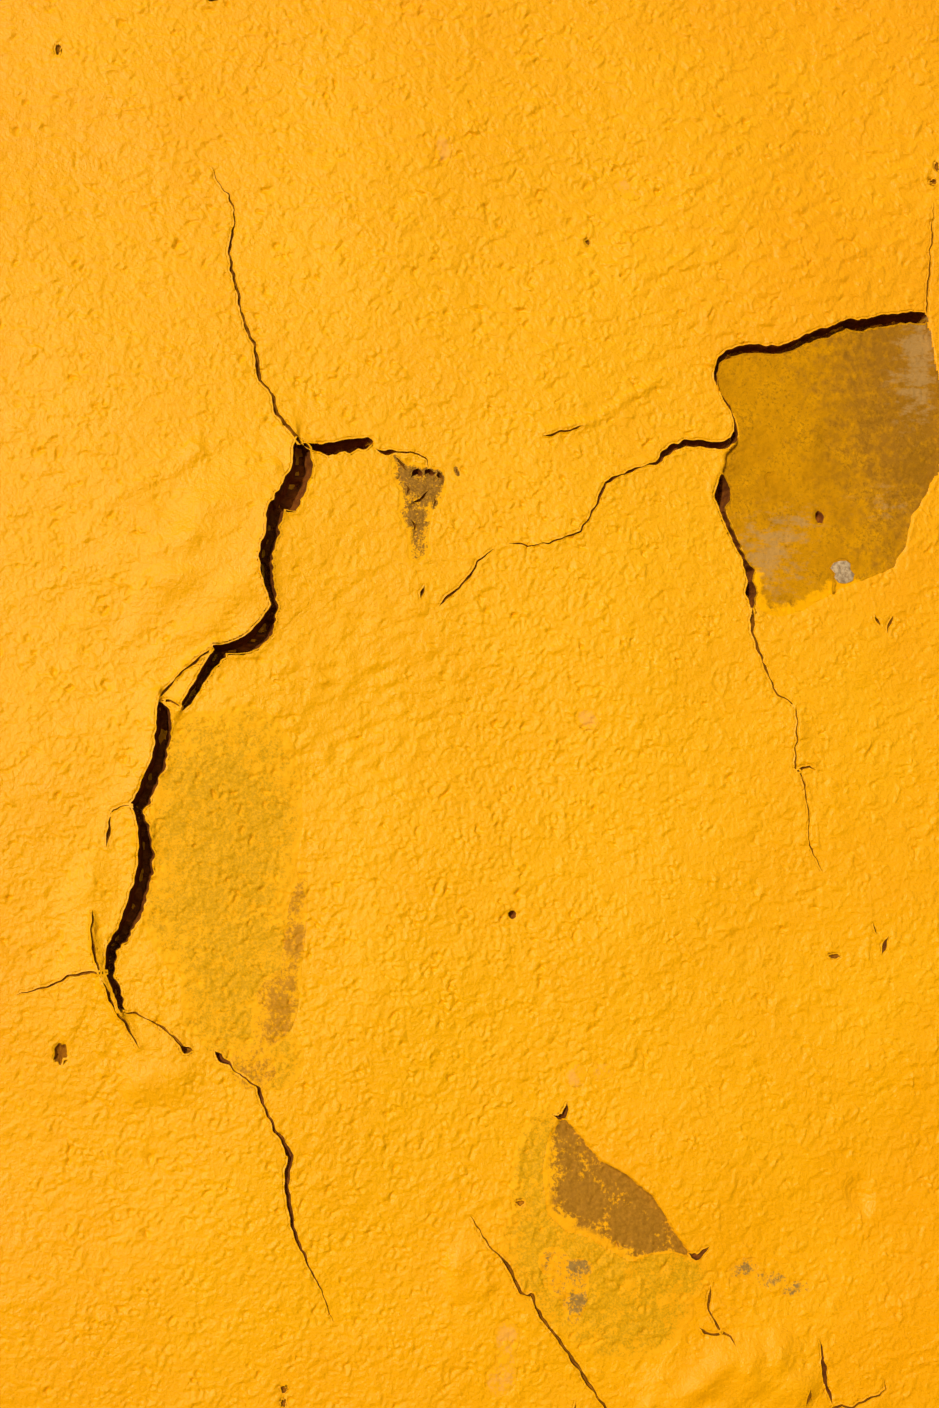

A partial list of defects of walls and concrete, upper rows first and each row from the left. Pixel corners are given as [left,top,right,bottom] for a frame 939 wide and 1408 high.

spalling [928,160,939,185]
peeling [392,455,460,563]
crack [418,390,739,607]
spalling [712,202,939,709]
crack [16,166,431,1323]
crack [792,704,823,872]
peeling [542,1101,710,1262]
crack [469,1215,609,1408]
crack [698,1285,737,1347]
crack [805,1340,887,1408]